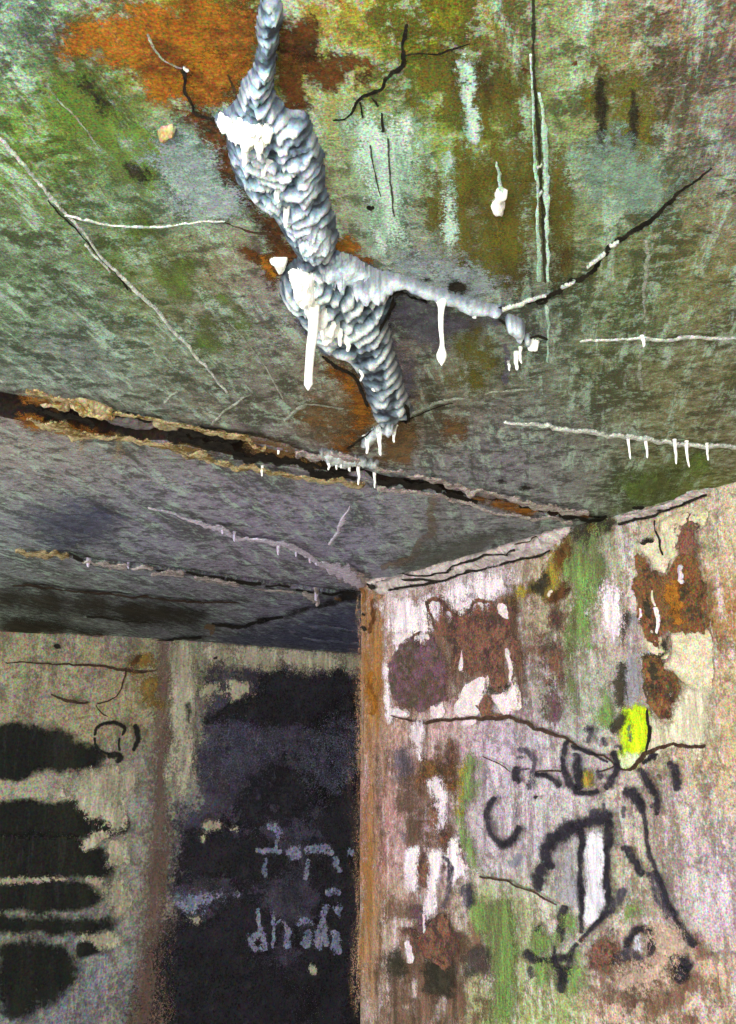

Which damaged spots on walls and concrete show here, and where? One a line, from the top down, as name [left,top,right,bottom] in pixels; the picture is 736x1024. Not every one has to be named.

corrosion [54,0,298,291]
corrosion [274,13,376,112]
crack [333,24,470,217]
damp [454,53,483,148]
corrosion [336,235,374,264]
damp [337,108,505,401]
crack [498,168,712,385]
crack [388,536,550,591]
damp [0,584,208,1024]
damp [298,716,361,795]
corrosion [353,587,389,1015]
crack [390,709,706,772]